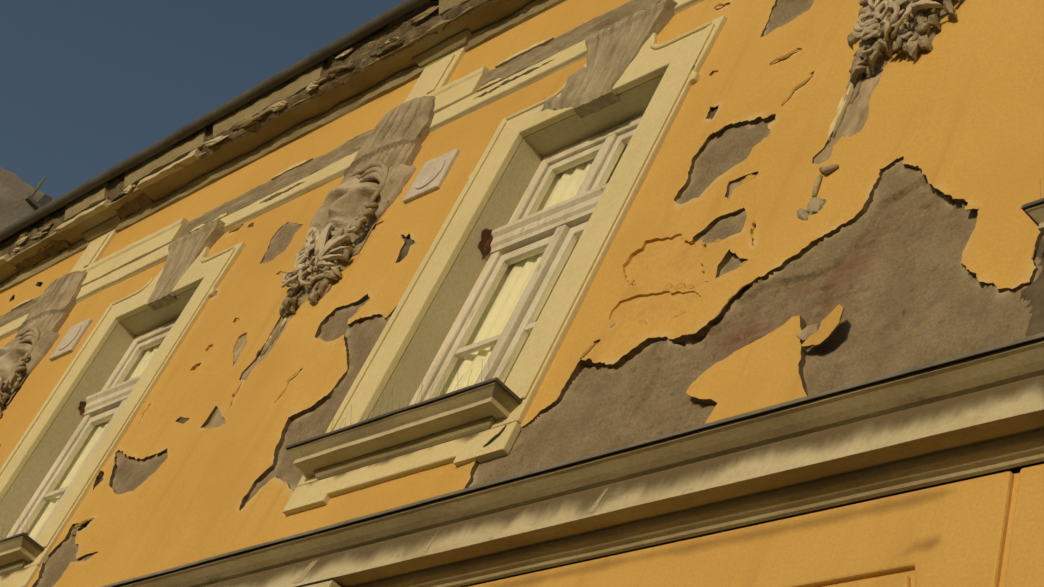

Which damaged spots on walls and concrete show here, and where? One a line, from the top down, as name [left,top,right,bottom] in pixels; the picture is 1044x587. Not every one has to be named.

spalling [201,0,497,161]
spalling [474,0,661,99]
flaking render [764,0,814,36]
spalling [179,129,374,238]
peeling [677,106,775,246]
spalling [11,215,71,271]
flaking render [262,222,302,264]
spalling [0,282,42,327]
peeling [469,160,1044,487]
peeling [245,294,391,505]
peeling [95,450,168,494]
peeling [36,519,93,587]